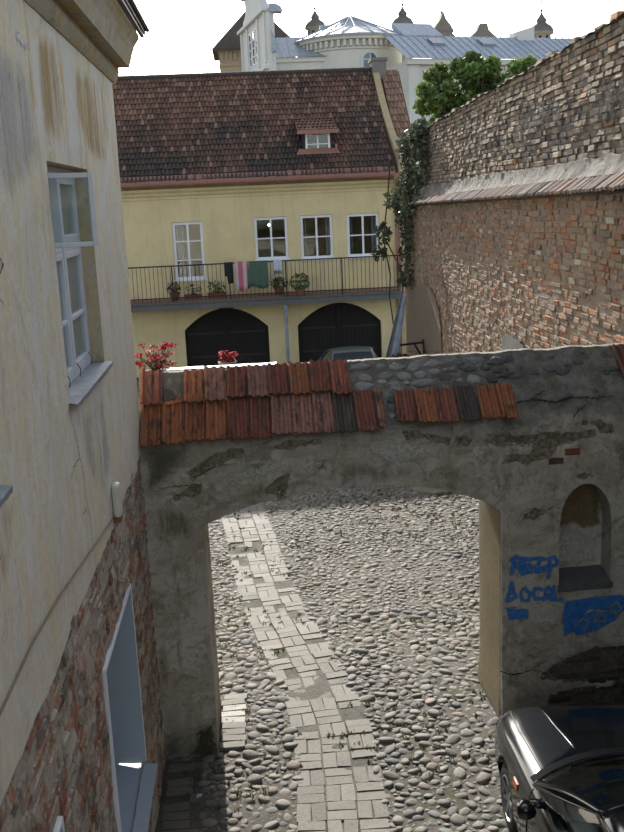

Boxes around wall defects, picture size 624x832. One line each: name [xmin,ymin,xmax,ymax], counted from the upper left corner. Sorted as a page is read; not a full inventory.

leakage [40,43,59,126]
crack [499,390,613,421]
spalling [485,419,614,466]
spalling [173,447,246,501]